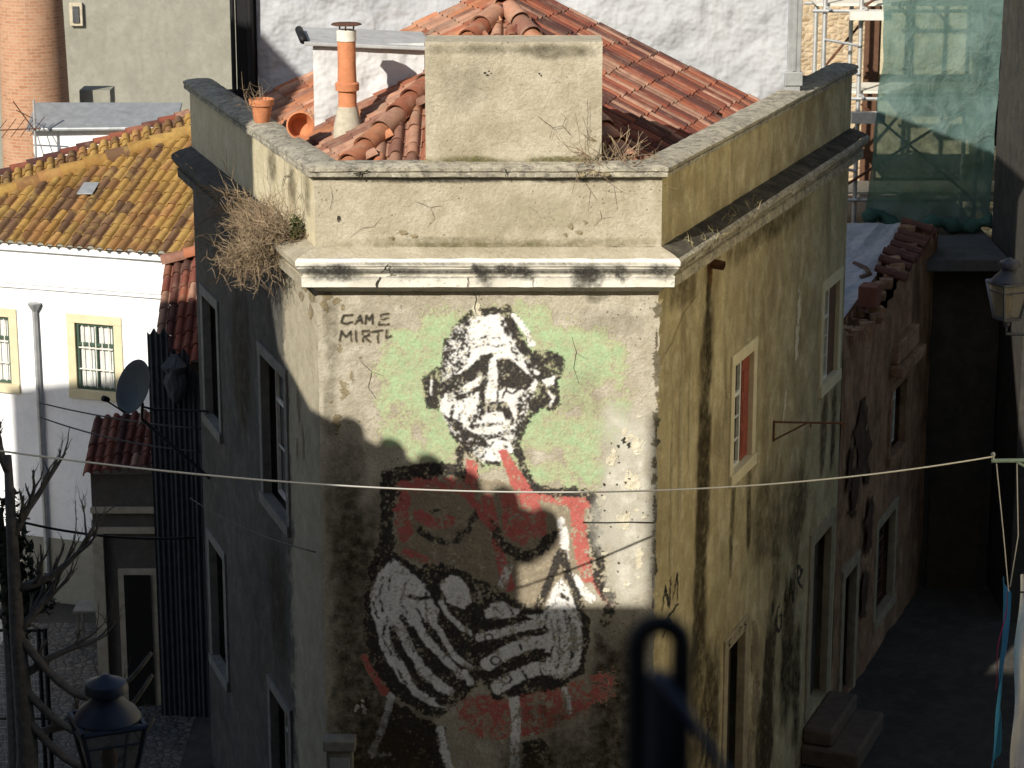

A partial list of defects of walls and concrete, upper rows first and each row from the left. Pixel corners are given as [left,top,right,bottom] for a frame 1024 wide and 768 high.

damp [305,263,671,290]
peeling [599,301,662,611]
damp [671,268,712,768]